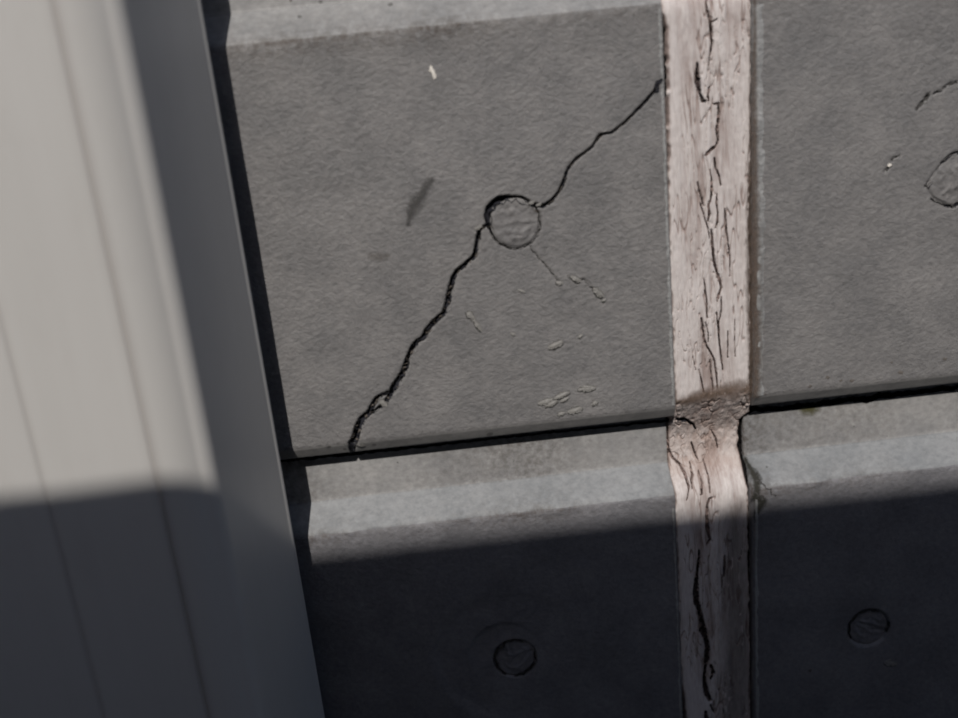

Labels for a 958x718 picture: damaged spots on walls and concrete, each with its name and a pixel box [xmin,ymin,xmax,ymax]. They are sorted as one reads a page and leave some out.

crack [345,78,663,451]
peeling [538,384,599,417]
crack [692,0,736,391]
crack [915,81,956,110]
crack [666,418,726,718]